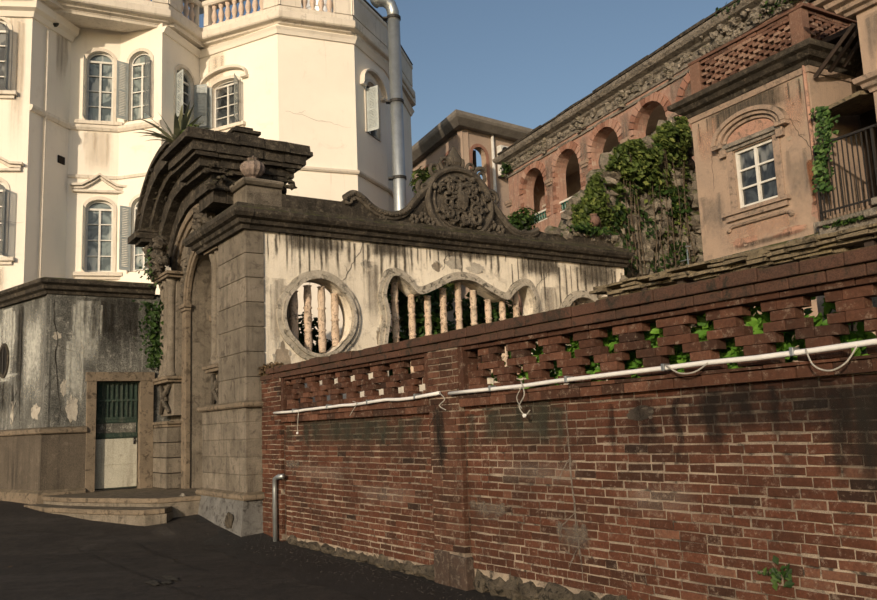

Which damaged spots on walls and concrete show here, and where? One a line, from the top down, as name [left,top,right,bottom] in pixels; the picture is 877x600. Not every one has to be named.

water stain [267,234,506,280]
water stain [512,258,622,305]
peeling [0,308,42,424]
peeling [52,301,103,422]